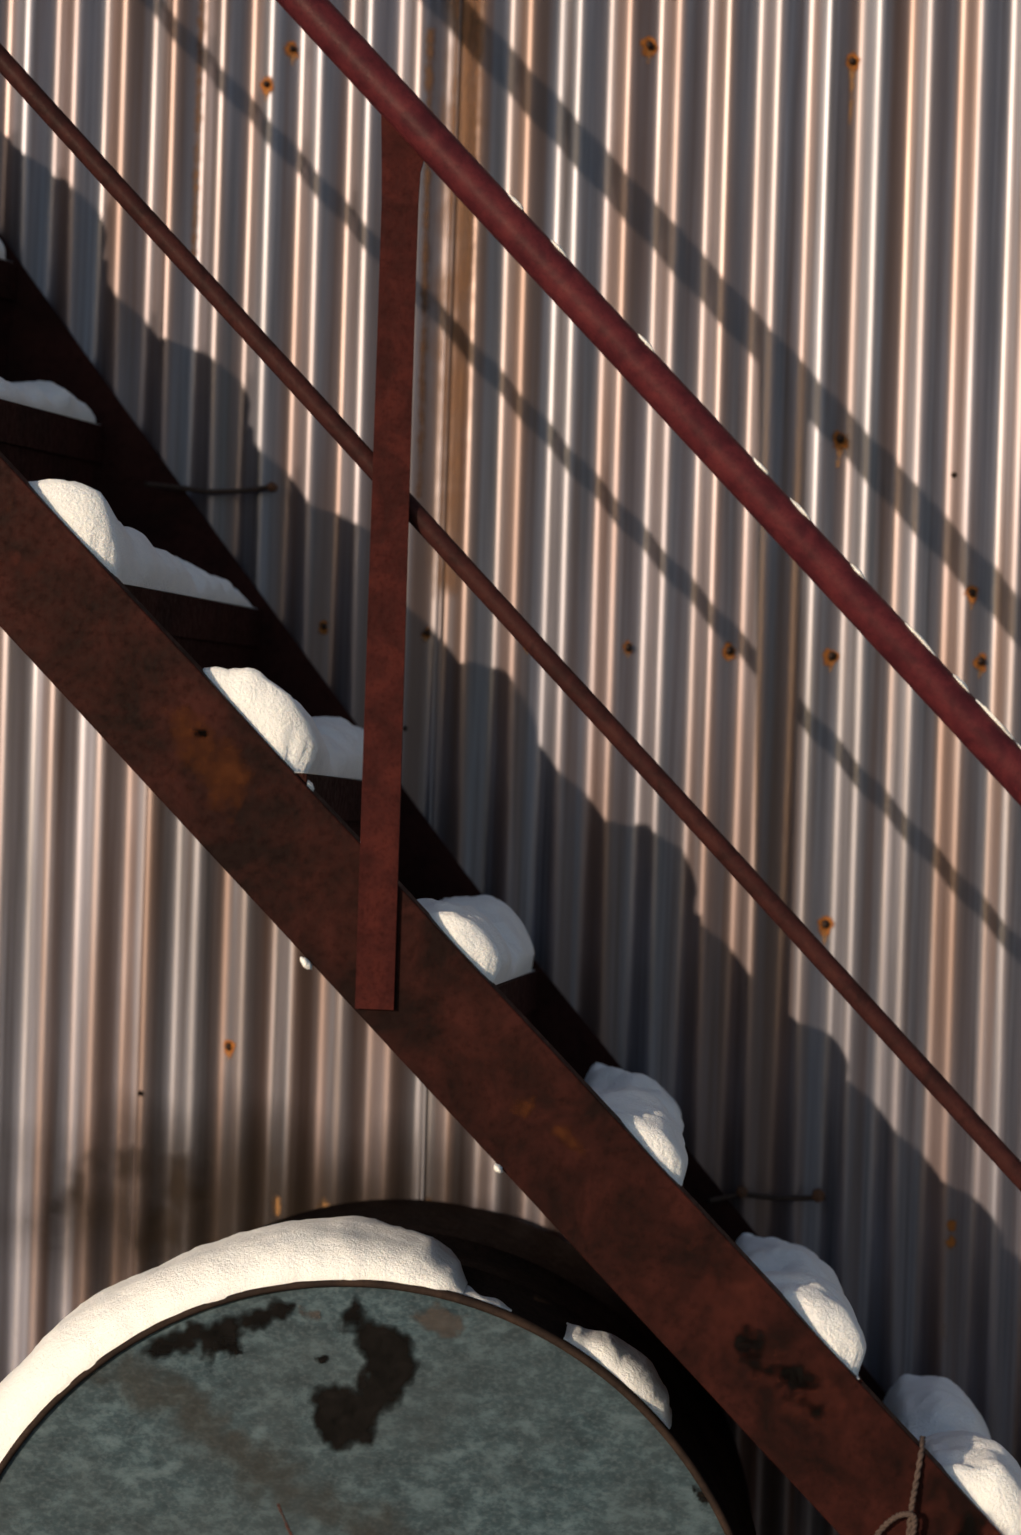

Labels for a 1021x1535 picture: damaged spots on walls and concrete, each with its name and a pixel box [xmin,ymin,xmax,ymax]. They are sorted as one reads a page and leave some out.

corrosion [284,41,299,61]
corrosion [640,36,658,58]
corrosion [259,76,274,95]
corrosion [425,0,482,160]
corrosion [846,52,860,115]
corrosion [418,164,473,535]
corrosion [437,556,455,587]
corrosion [818,916,834,942]